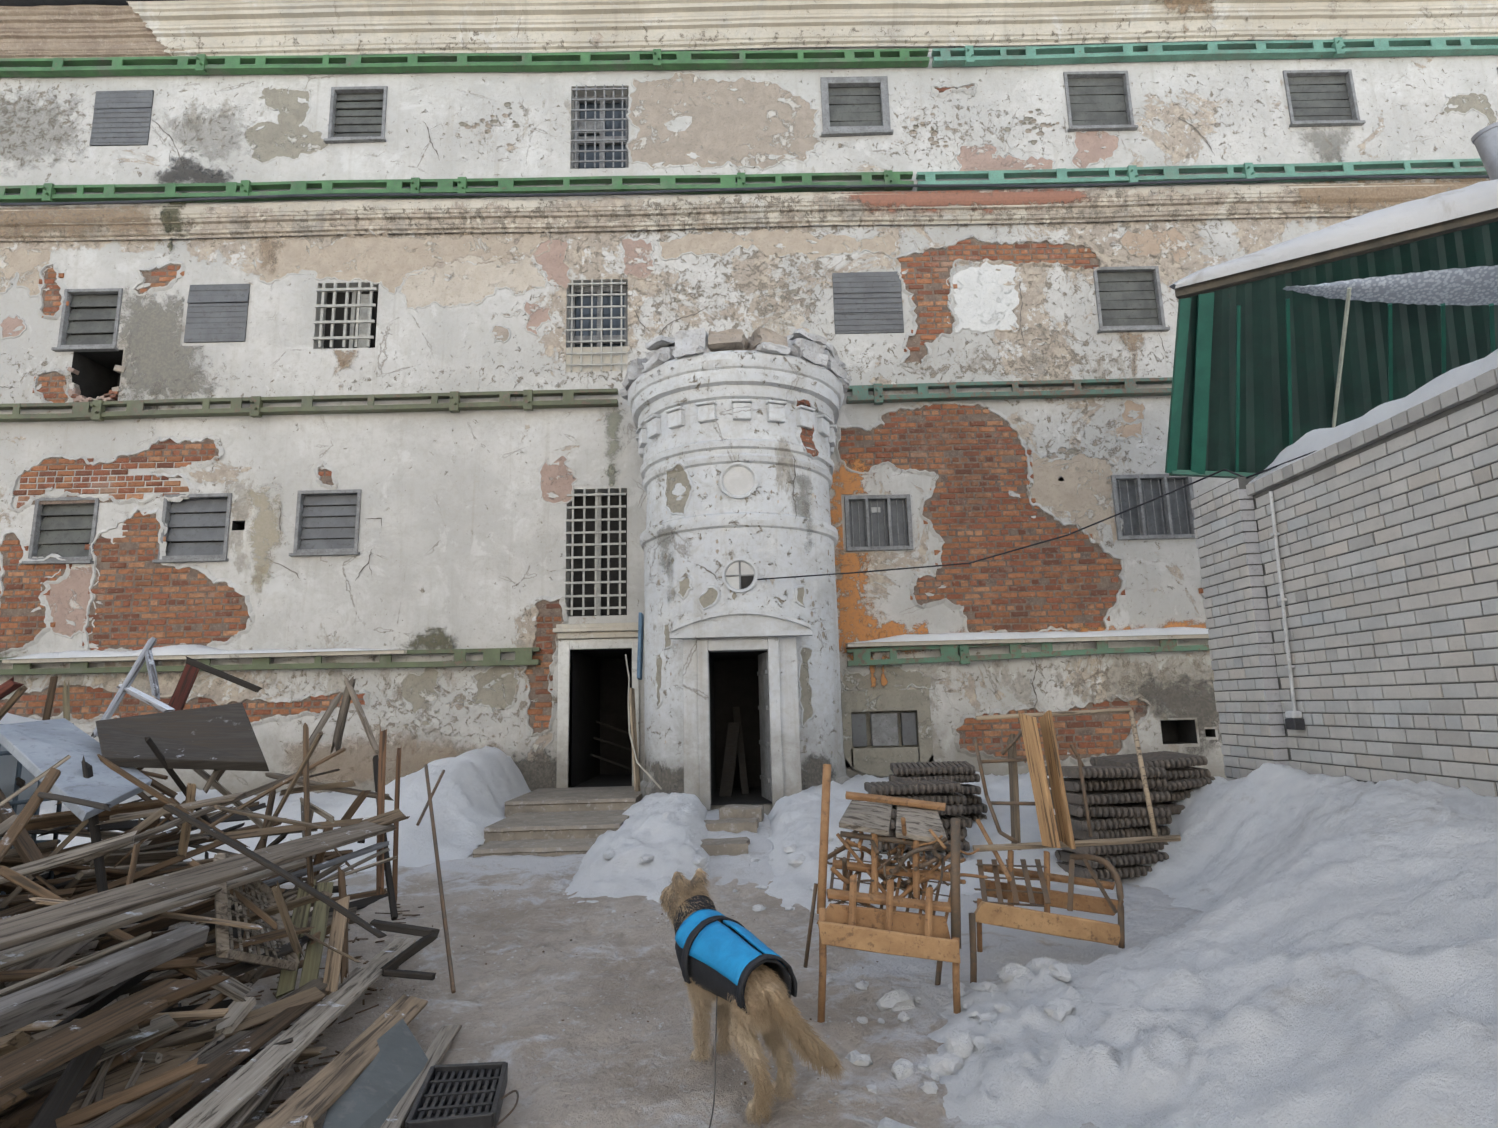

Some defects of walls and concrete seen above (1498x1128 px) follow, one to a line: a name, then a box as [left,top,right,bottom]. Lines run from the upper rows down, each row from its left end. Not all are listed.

flaking render [243,86,330,164]
flaking render [626,71,822,171]
flaking render [131,260,186,298]
flaking render [619,225,1103,369]
flaking render [32,365,126,403]
flaking render [1114,399,1146,443]
flaking render [0,434,256,657]
flaking render [650,462,722,516]
flaking render [793,396,1126,633]
flaking render [0,680,371,726]
flaking render [399,595,569,779]
flaking render [951,693,1153,767]